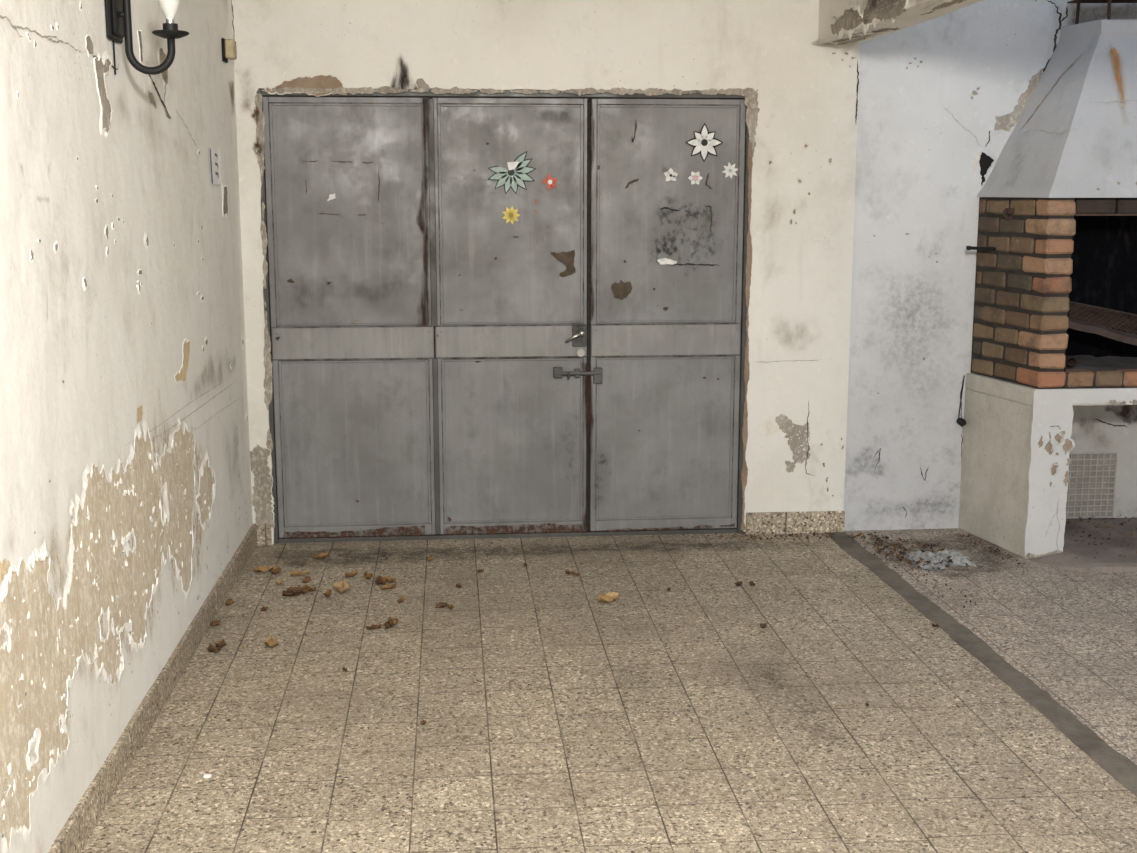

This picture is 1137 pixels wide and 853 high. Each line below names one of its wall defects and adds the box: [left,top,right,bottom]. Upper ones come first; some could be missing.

crack [0,15,82,53]
flaking render [85,35,119,140]
crack [149,75,196,145]
spalling [810,0,966,122]
crack [1020,0,1081,135]
flaking render [255,74,760,530]
flaking render [239,429,275,528]
rust [285,526,425,539]
rust [583,363,593,439]
rust [446,496,735,535]
peeling [763,402,834,497]
peeling [0,405,216,853]